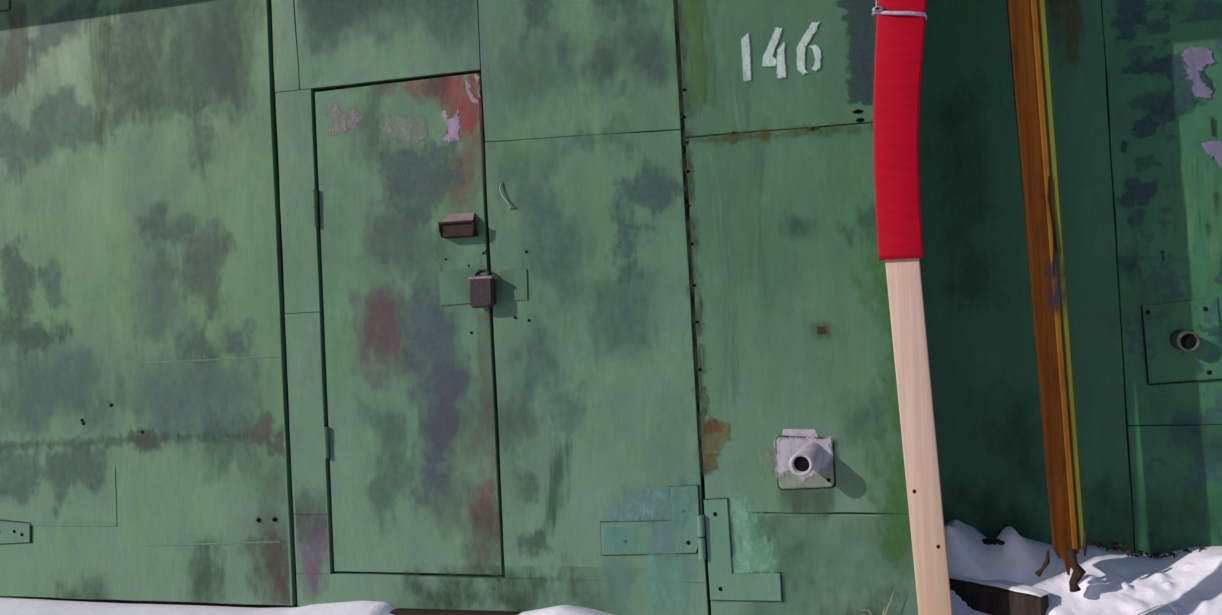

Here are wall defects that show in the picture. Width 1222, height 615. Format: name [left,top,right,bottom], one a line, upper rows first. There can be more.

peeling [464,74,480,104]
peeling [1132,37,1222,139]
peeling [440,109,460,143]
peeling [1200,136,1222,169]
corrosion [686,283,730,474]